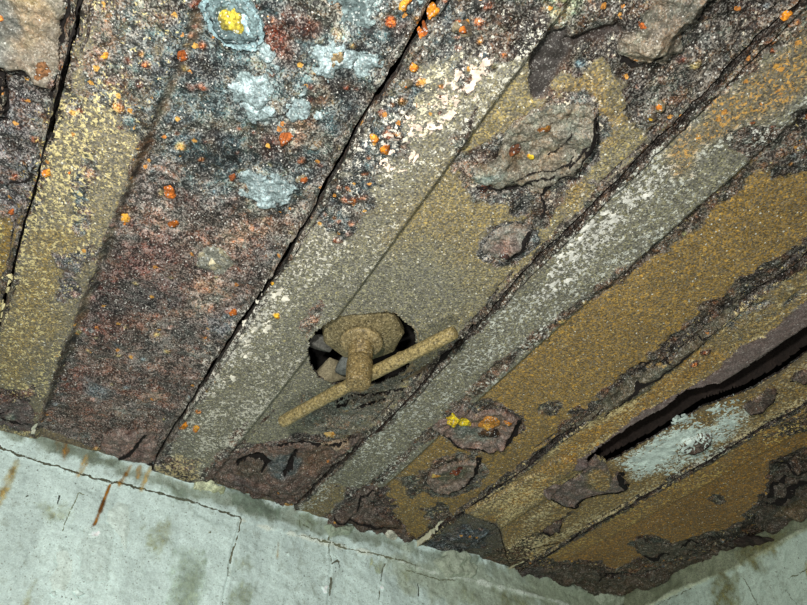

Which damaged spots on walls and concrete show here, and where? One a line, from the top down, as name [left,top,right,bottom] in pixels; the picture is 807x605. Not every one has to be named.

rust [0,0,70,120]
rust [198,0,265,52]
water stain [221,41,280,124]
water stain [308,40,384,83]
crack [6,132,54,187]
water stain [238,169,299,209]
peeling [622,188,652,212]
peeling [545,210,620,292]
crack [336,350,451,409]
crack [0,445,242,576]
rust [93,421,158,526]
peeling [619,394,748,477]